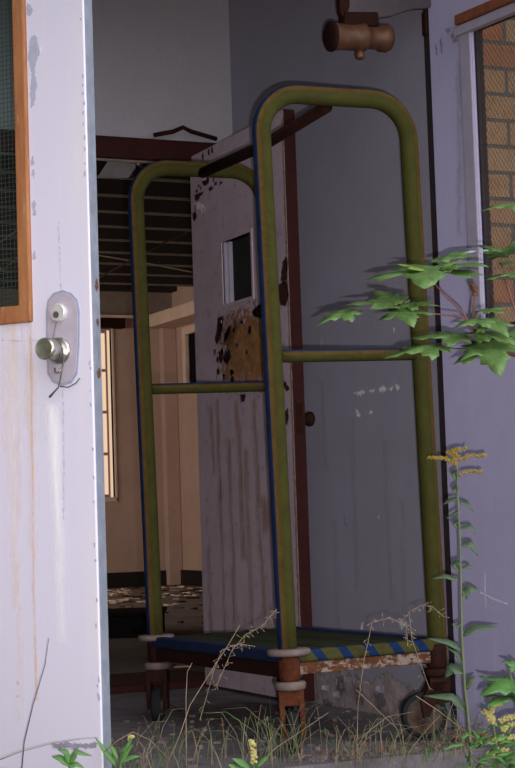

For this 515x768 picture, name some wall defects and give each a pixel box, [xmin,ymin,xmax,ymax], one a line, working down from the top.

peeling [28,36,40,108]
peeling [192,177,223,222]
peeling [213,305,261,382]